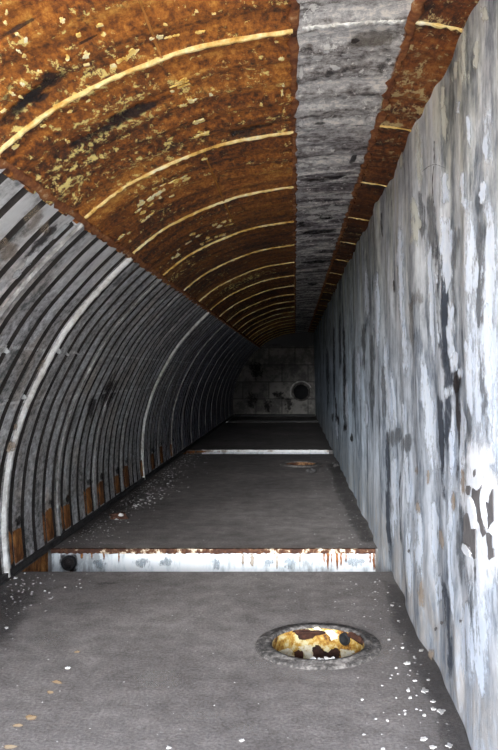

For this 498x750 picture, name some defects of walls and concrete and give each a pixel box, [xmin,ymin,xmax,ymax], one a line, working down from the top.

peeling [110,48,139,71]
peeling [169,77,190,93]
peeling [134,175,191,223]
rust [83,473,104,514]
rust [113,458,129,494]
rust [42,495,71,542]
peeling [460,436,498,601]
rust [9,516,24,564]
rust [323,553,347,569]